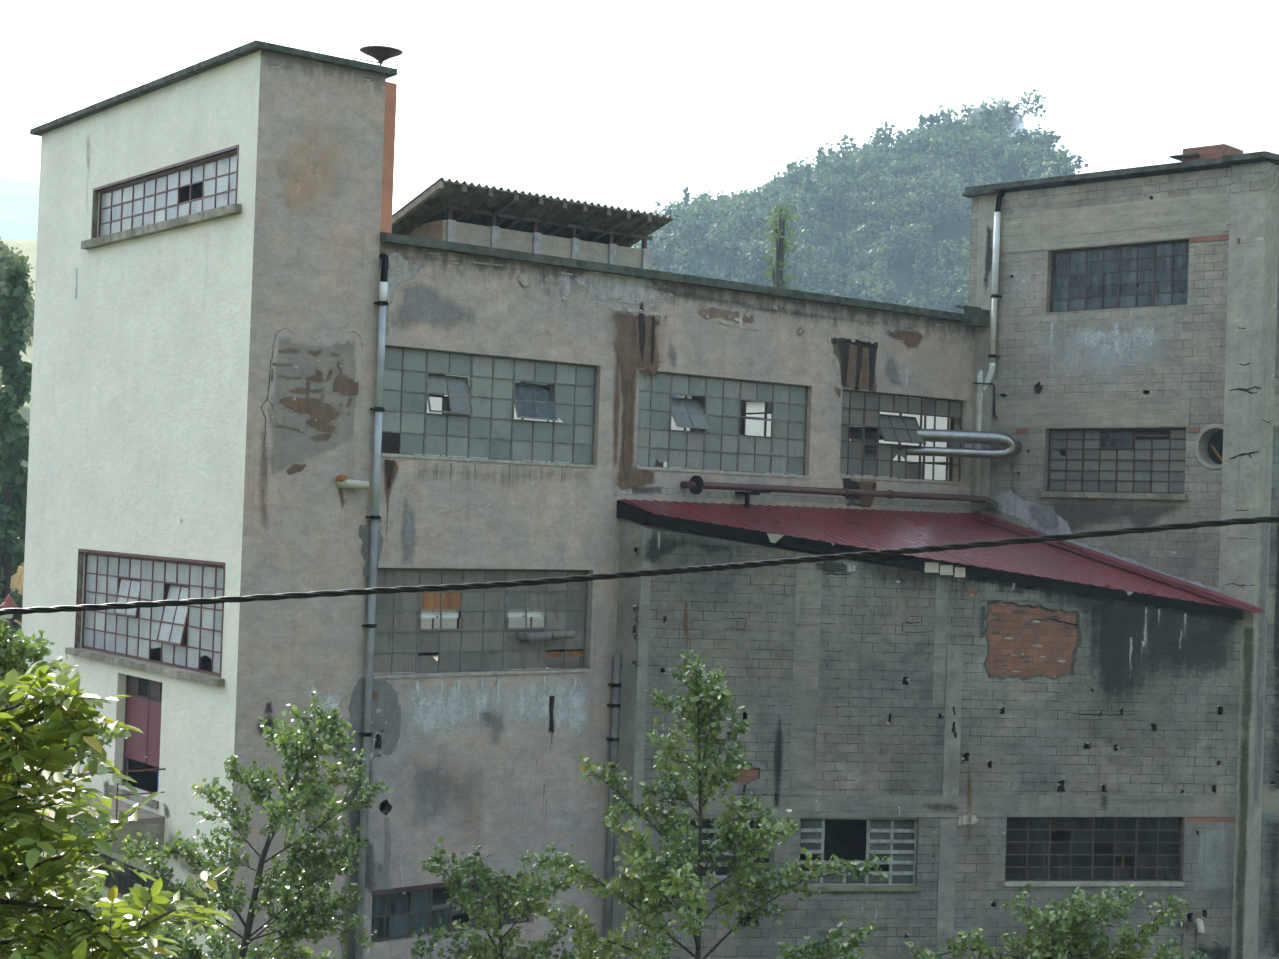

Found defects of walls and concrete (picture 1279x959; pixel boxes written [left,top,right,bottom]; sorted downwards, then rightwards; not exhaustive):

peeling [698,307,760,331]
peeling [271,340,359,441]
crack [1229,386,1273,459]
peeling [286,464,306,475]
spalling [966,589,1081,681]
leakage [1094,609,1160,688]
leakage [1254,524,1279,803]